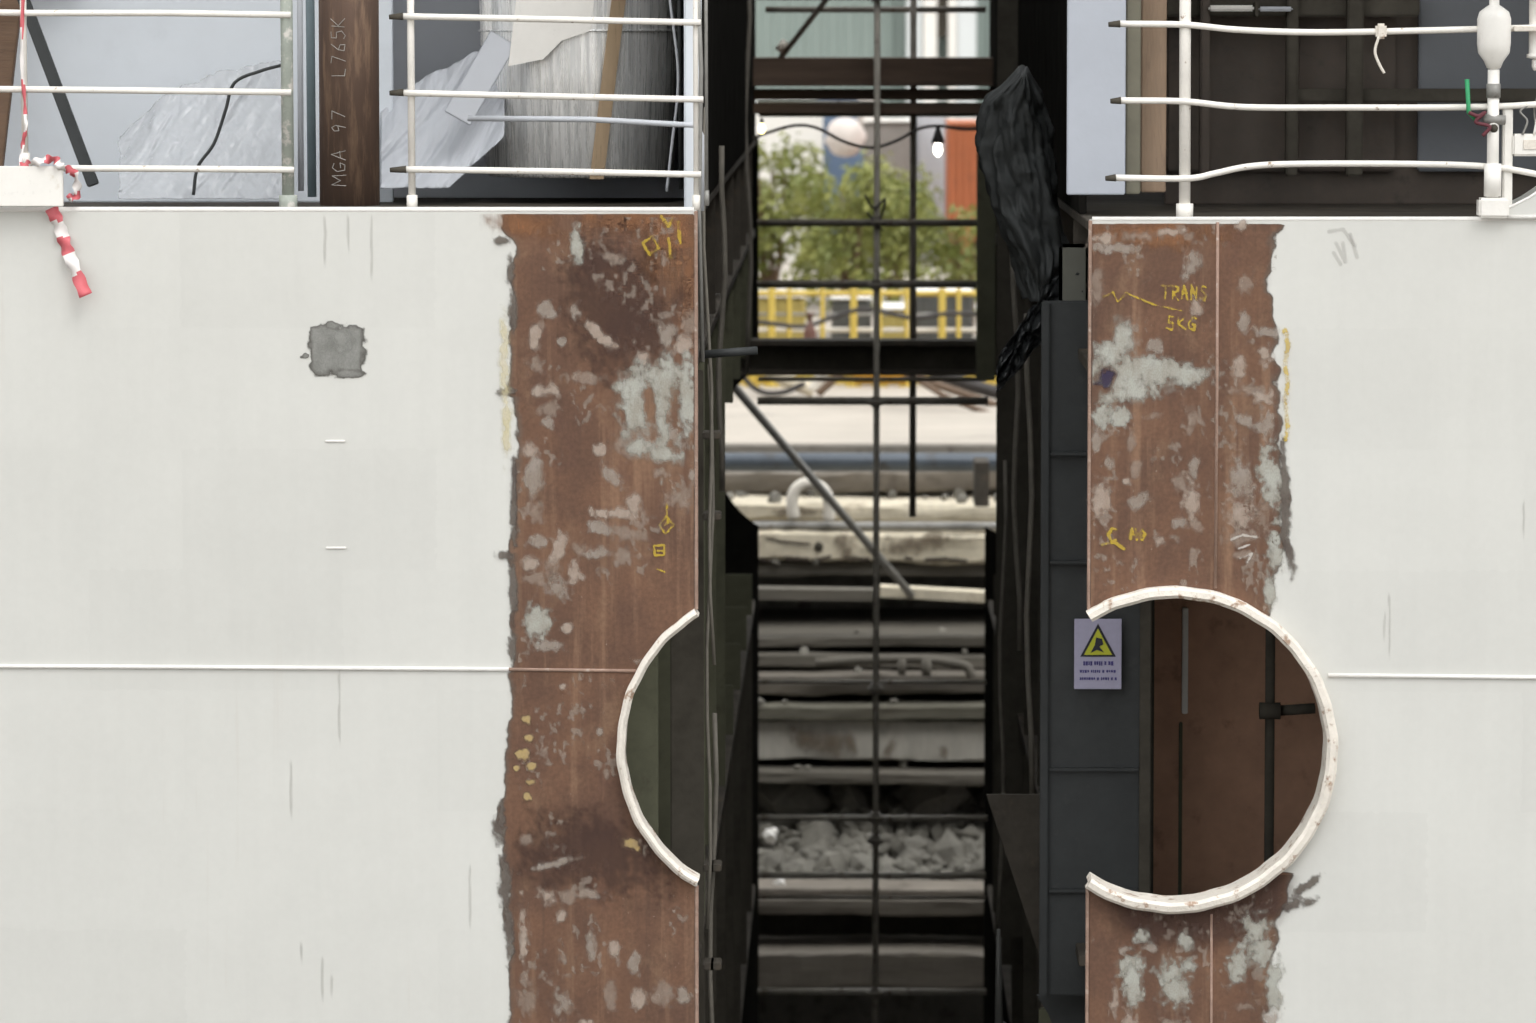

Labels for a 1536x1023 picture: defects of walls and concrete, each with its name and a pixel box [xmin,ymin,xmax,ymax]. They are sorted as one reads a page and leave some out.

corrosion [1095,223,1222,247]
corrosion [568,214,694,372]
peeling [300,321,367,378]
peeling [1233,313,1278,377]
peeling [1231,391,1283,604]
peeling [513,715,537,801]
corrosion [522,815,660,889]
peeling [520,912,528,962]
corrosion [1124,875,1282,941]
peeling [1226,916,1283,1023]